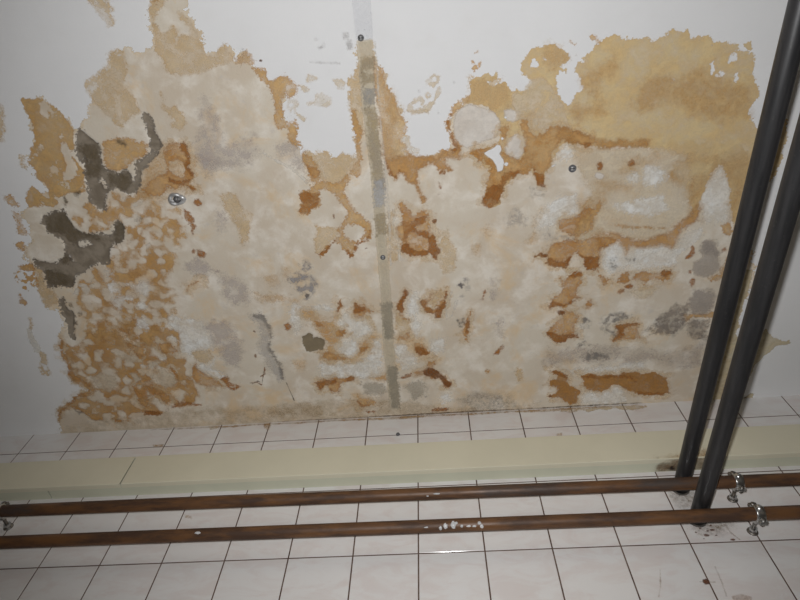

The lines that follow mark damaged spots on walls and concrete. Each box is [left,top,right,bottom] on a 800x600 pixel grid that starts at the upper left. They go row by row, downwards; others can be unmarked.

damp [15,264,58,306]
damp [6,98,85,251]
damp [102,137,147,171]
damp [57,143,239,422]
damp [251,68,372,257]
damp [288,265,385,394]
peeling [21,0,735,433]
damp [373,28,759,277]
damp [582,385,626,406]
damp [713,270,752,400]
peeling [740,250,757,300]
damp [769,118,788,182]